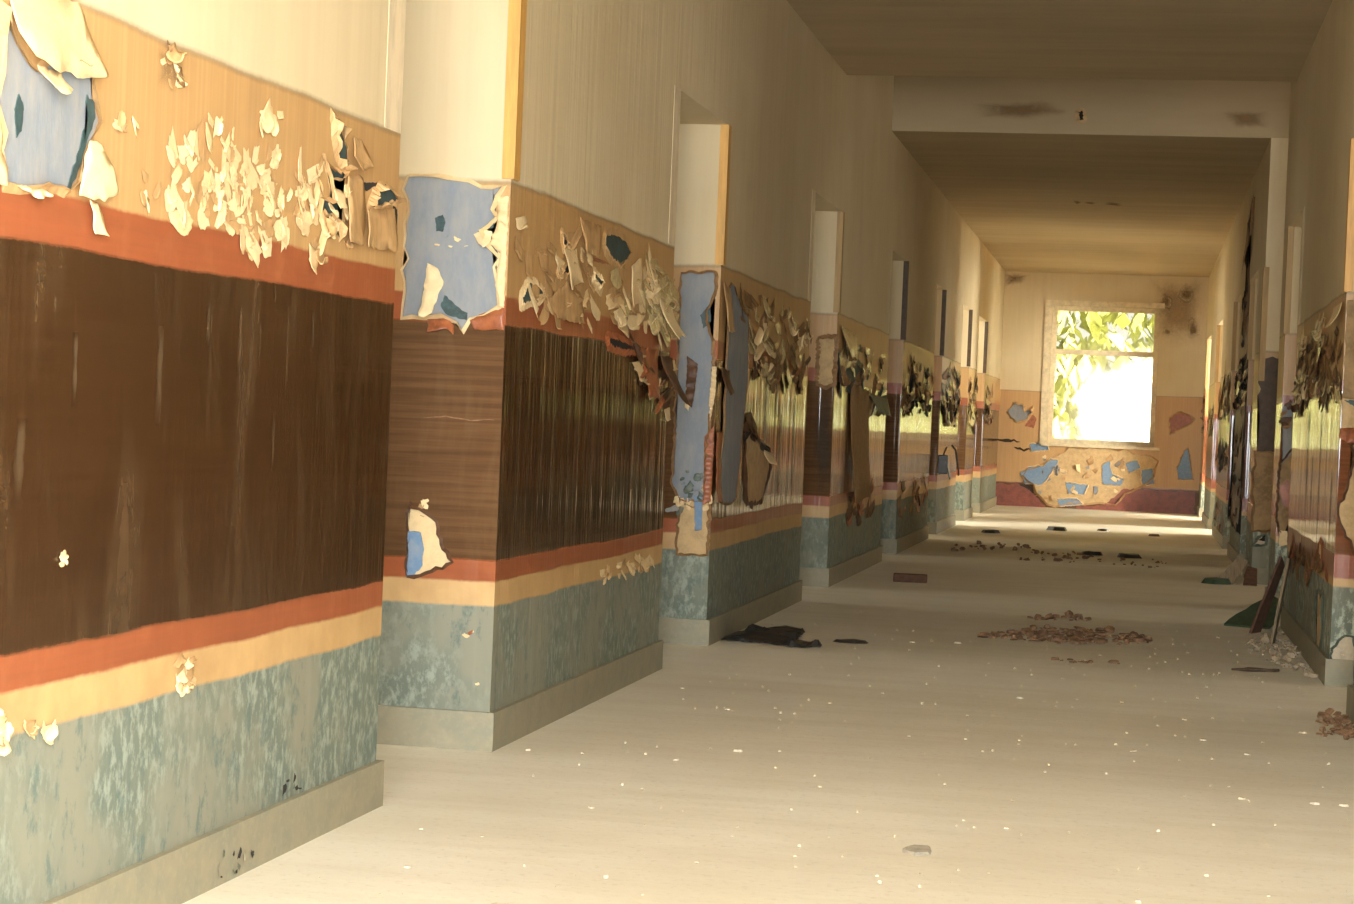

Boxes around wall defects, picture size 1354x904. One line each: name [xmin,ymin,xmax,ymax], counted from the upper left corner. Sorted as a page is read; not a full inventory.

peeling [0,0,139,237]
peeling [140,96,1195,557]
leakage [1241,195,1255,348]
peeling [59,550,69,567]
peeling [404,499,454,579]
peeling [600,553,655,585]
peeling [1168,300,1354,660]
peeling [0,709,58,756]